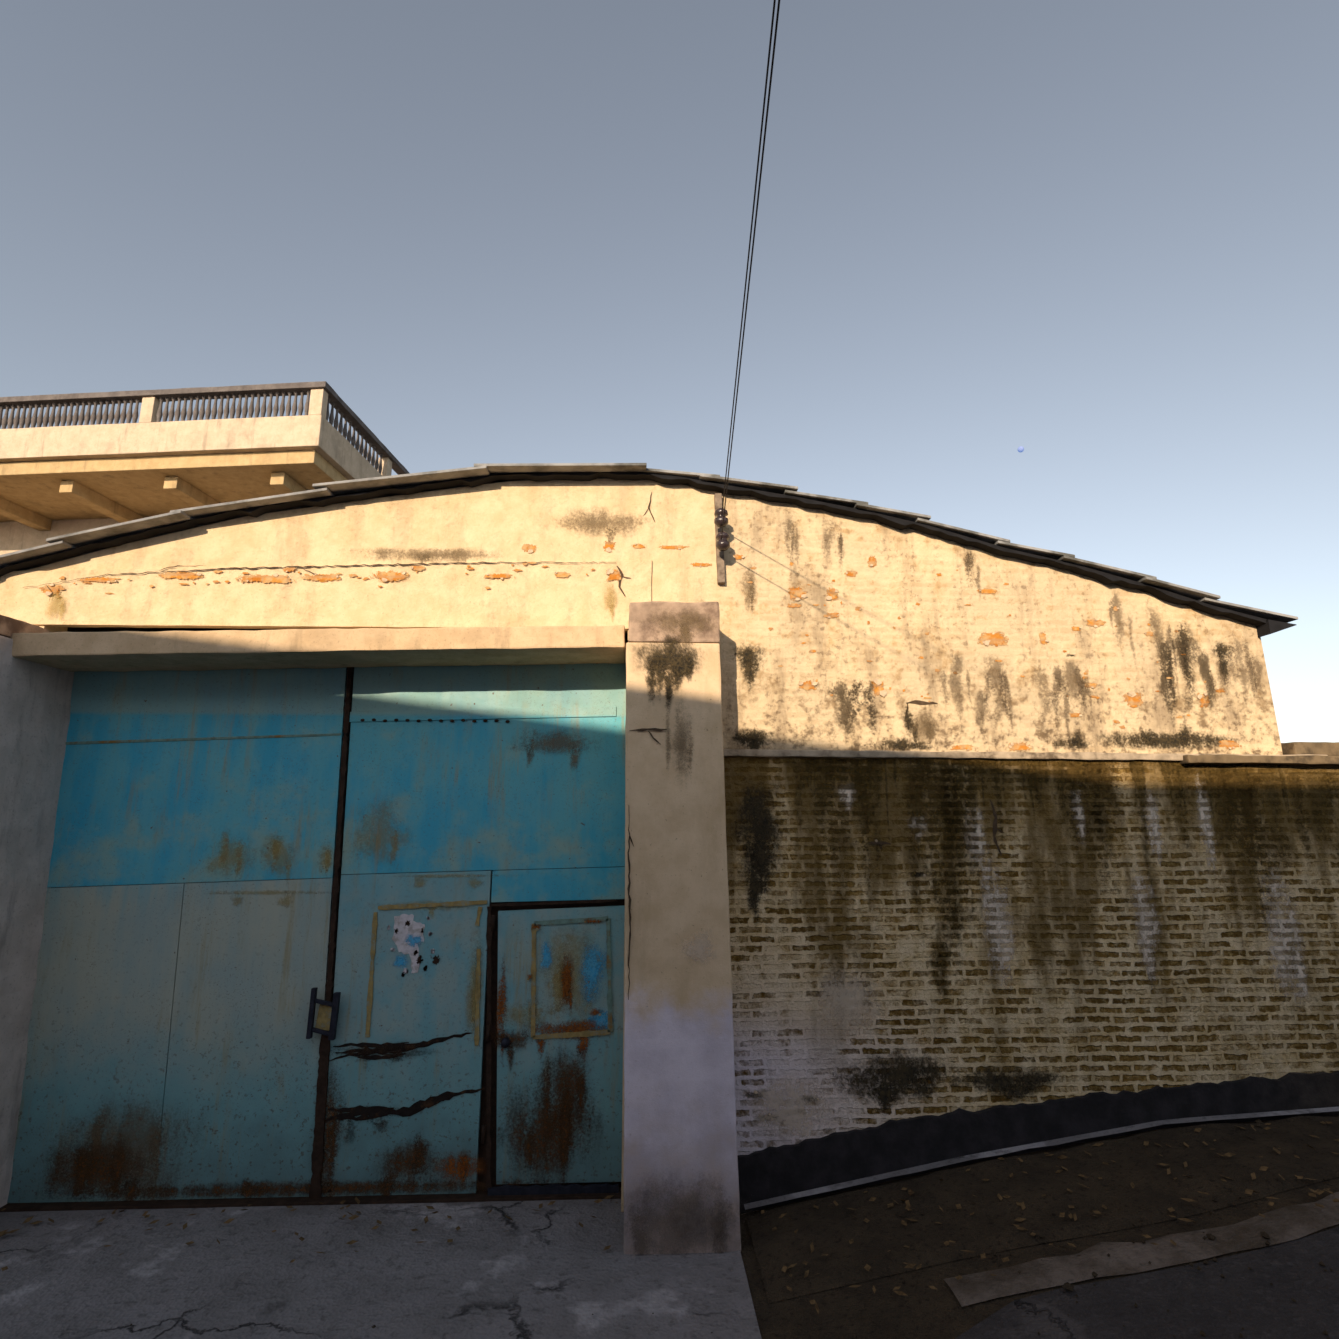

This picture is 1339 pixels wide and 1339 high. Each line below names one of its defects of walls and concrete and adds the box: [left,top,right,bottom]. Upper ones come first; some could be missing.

spalling [39,576,130,598]
spalling [149,566,425,587]
spalling [465,544,570,589]
damp [744,661,757,684]
spalling [977,631,1009,662]
damp [1160,632,1228,713]
damp [848,682,878,734]
corrosion [524,732,580,767]
damp [748,822,771,920]
damp [779,712,1339,997]
corrosion [491,957,600,1186]
corrosion [101,1072,486,1201]